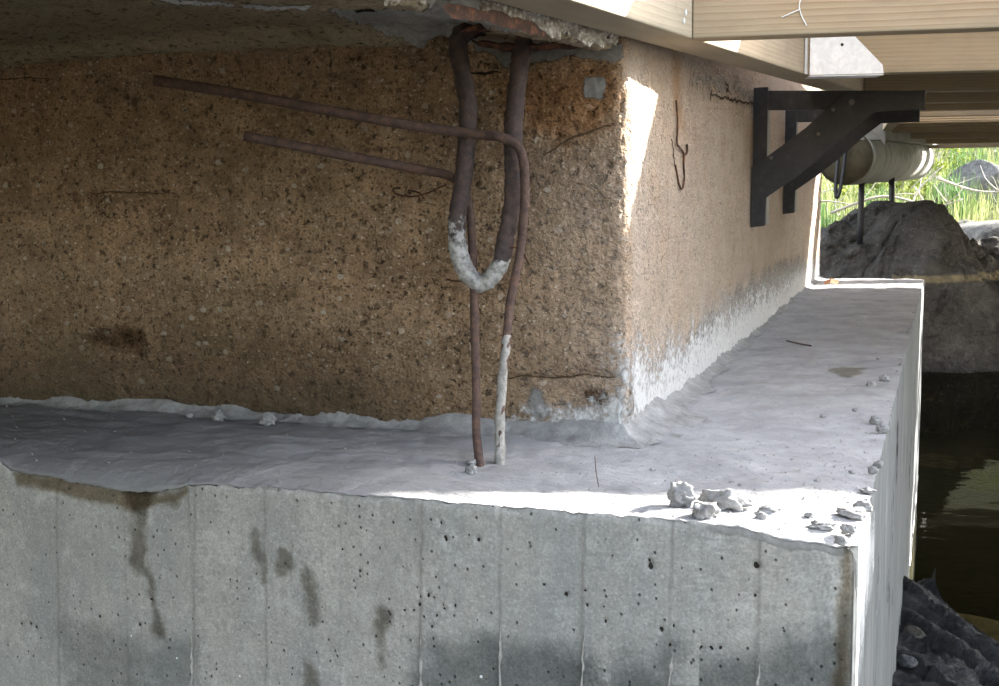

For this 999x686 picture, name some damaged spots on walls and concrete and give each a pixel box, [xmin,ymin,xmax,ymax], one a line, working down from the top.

crack [162,0,316,11]
rust [442,3,578,52]
crack [710,84,753,105]
spalling [153,0,533,467]
crack [507,372,621,380]
water stain [830,367,864,377]